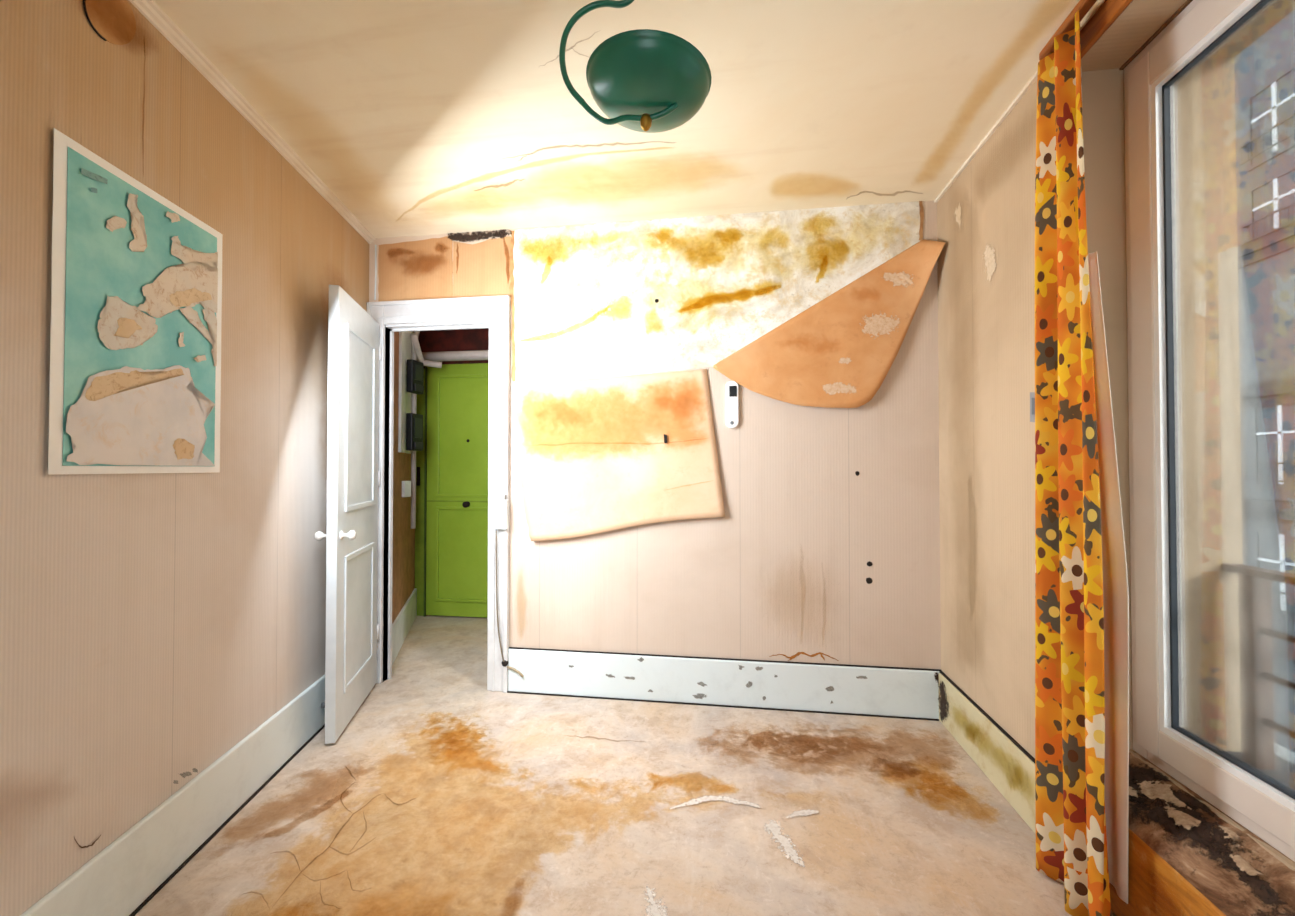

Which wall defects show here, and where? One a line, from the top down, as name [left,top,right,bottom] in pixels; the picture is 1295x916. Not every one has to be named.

damp [448,229,512,242]
flaking render [509,201,924,385]
damp [934,672,949,722]
damp [1129,763,1295,916]